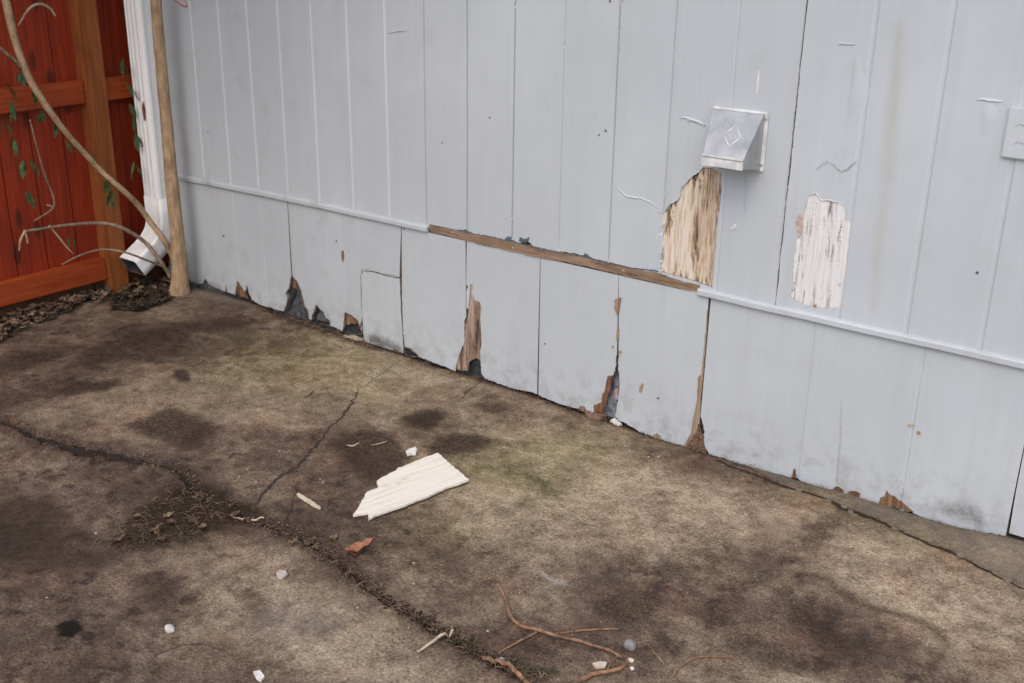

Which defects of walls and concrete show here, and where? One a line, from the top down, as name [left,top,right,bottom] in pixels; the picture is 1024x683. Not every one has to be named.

peeling [429,167,722,286]
peeling [790,192,851,309]
spalling [283,276,330,326]
spalling [343,312,364,336]
damp [131,408,216,445]
damp [406,412,442,429]
damp [429,434,490,455]
spalling [469,358,481,374]
spalling [604,373,622,426]
peeling [684,309,708,454]
crack [3,359,481,659]
peeling [878,491,913,512]